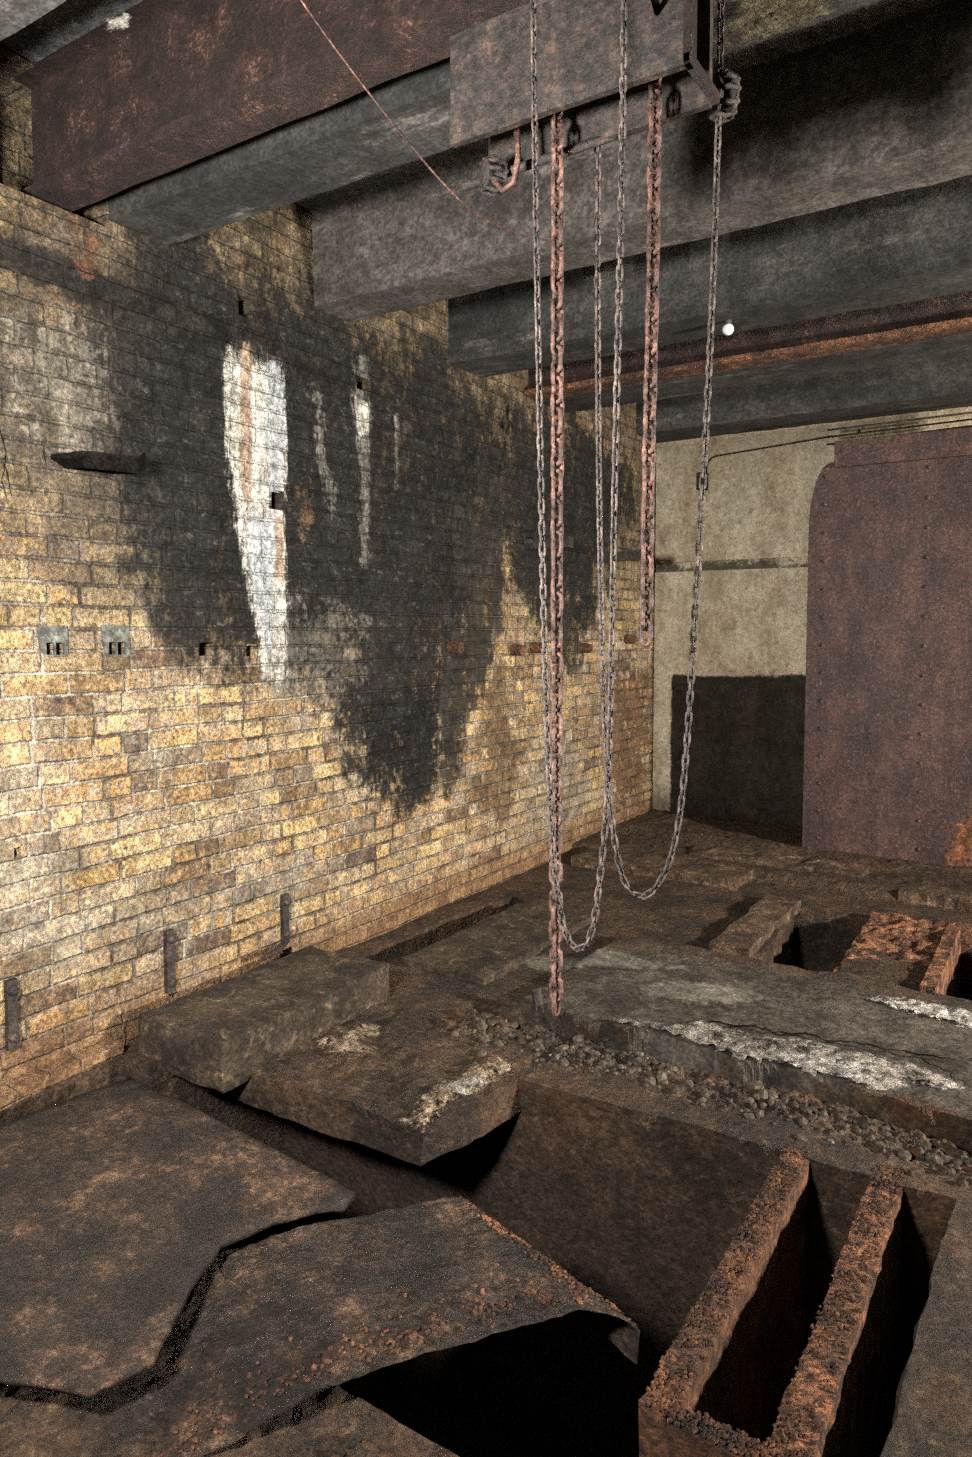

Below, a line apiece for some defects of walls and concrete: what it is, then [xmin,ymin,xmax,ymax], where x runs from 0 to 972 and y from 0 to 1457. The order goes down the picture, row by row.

damp [355,396,369,437]
damp [223,343,289,686]
rust [947,817,972,866]
damp [871,995,972,1028]
crack [707,1020,970,1086]